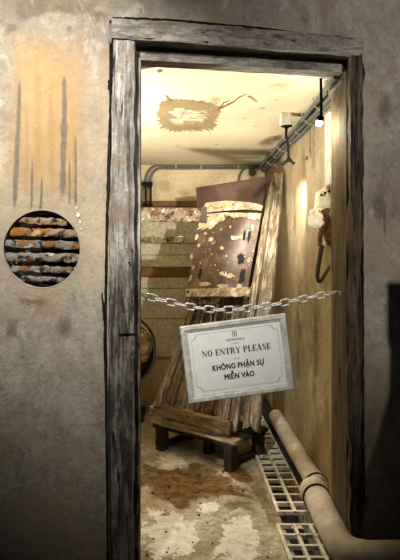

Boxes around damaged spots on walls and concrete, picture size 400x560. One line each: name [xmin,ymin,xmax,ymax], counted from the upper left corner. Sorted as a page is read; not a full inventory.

rust [19,49,75,183]
leakage [61,78,76,203]